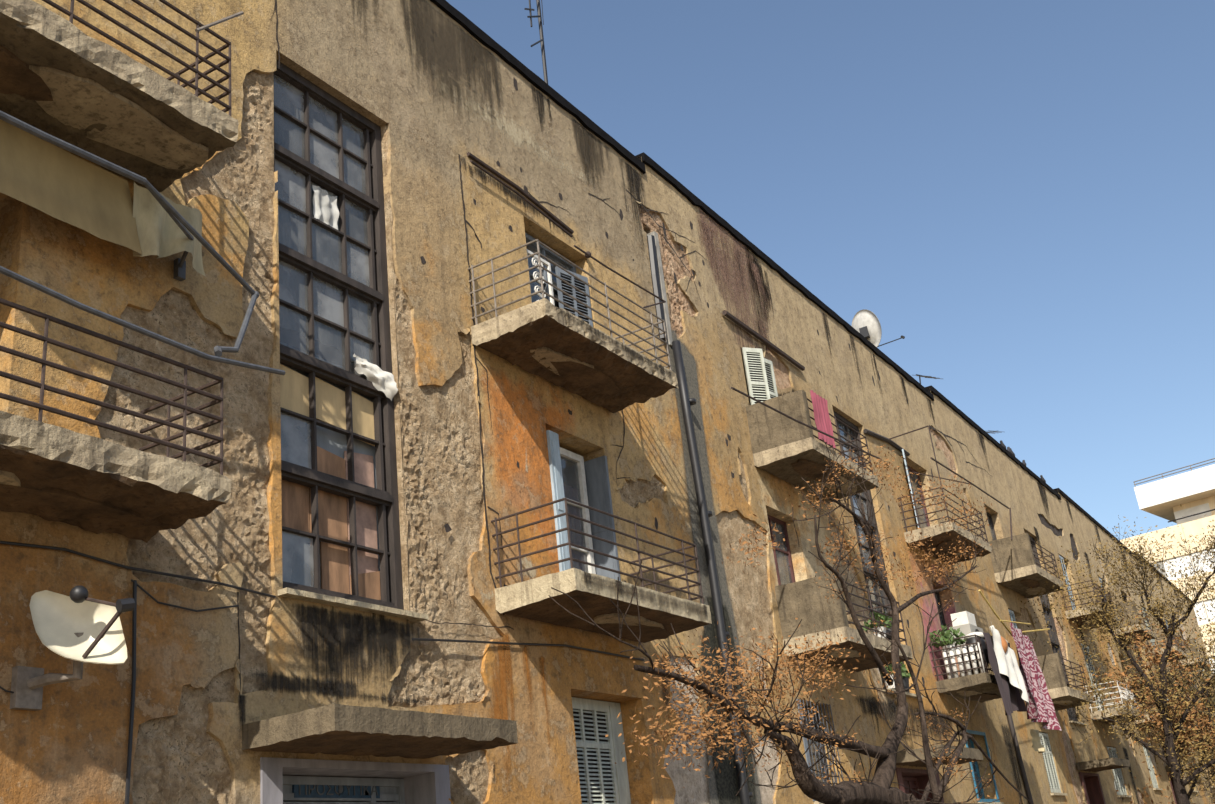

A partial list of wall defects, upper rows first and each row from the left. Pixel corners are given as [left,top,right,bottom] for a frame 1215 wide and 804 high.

flaking render [381,124,389,177]
damp [403,0,646,232]
crack [525,189,704,301]
damp [737,247,773,336]
flaking render [0,45,275,804]
flaking render [384,192,502,708]
flaking render [616,476,665,508]
flaking render [715,434,774,703]
damp [255,604,424,705]
spalling [593,613,670,640]
flaking render [444,750,495,804]
flaking render [664,656,711,804]